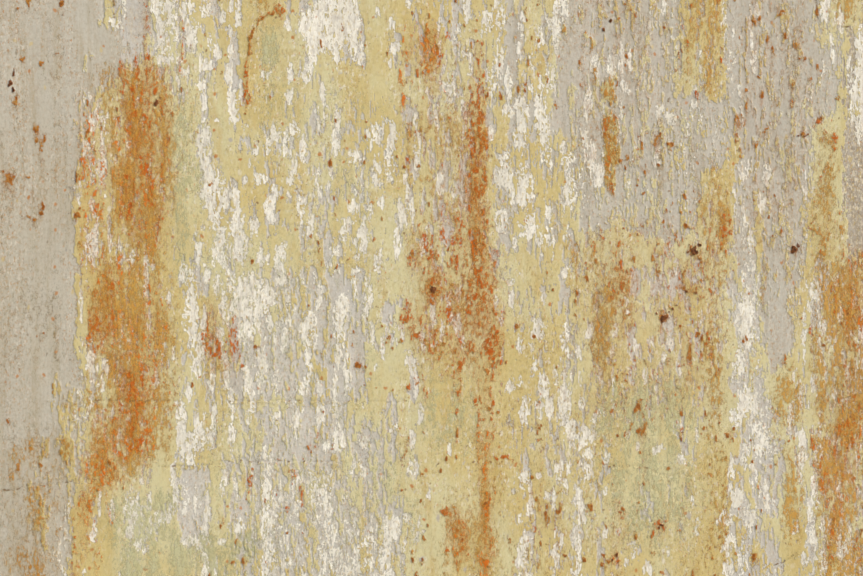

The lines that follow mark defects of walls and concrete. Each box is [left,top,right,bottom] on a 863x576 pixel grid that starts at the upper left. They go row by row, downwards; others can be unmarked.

peeling [387,17,428,84]
corrosion [398,13,450,107]
corrosion [593,67,629,192]
peeling [104,215,139,271]
peeling [132,238,169,395]
corrosion [381,40,514,576]
corrosion [651,201,714,298]
corrosion [808,211,863,352]
peeling [403,349,425,451]
peeling [86,489,116,543]
peeling [511,439,542,576]
corrosion [811,361,863,567]